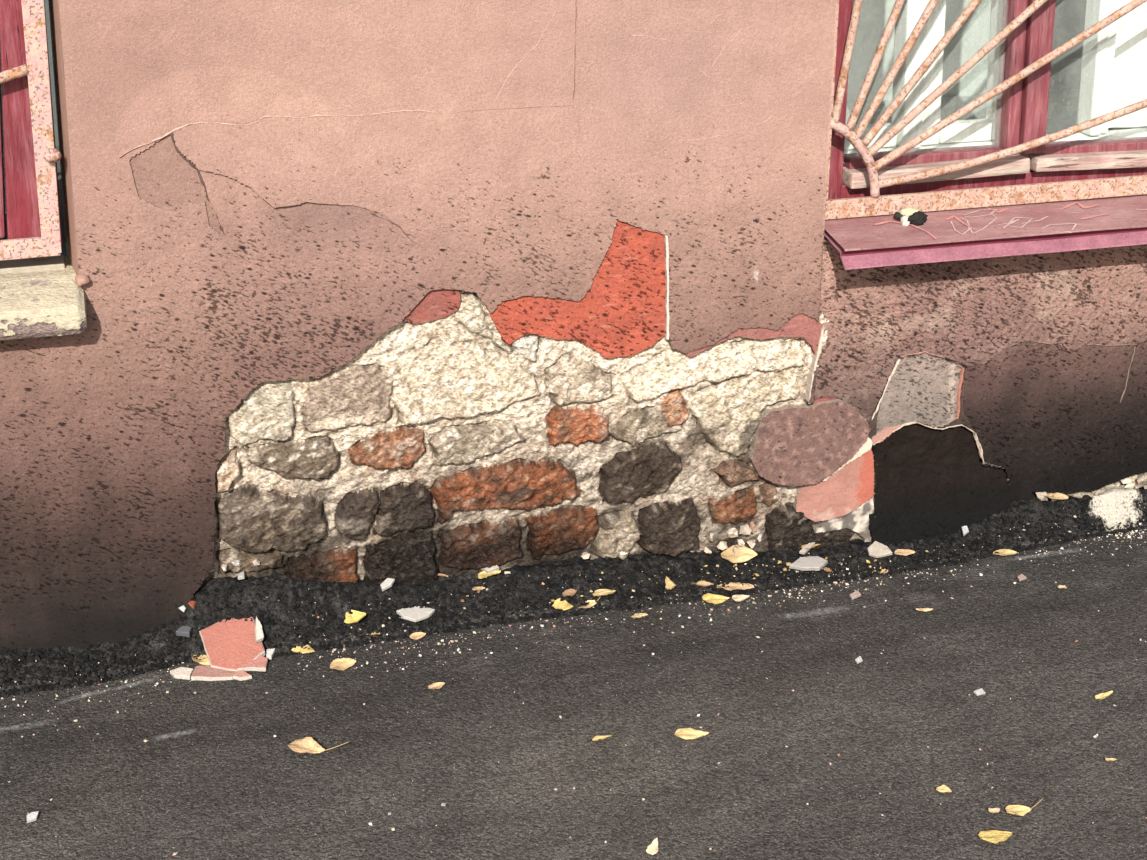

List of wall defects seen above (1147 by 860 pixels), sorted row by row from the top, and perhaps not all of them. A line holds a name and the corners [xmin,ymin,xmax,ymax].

peeling [129,134,223,234]
peeling [0,316,87,340]
spalling [202,219,1147,591]